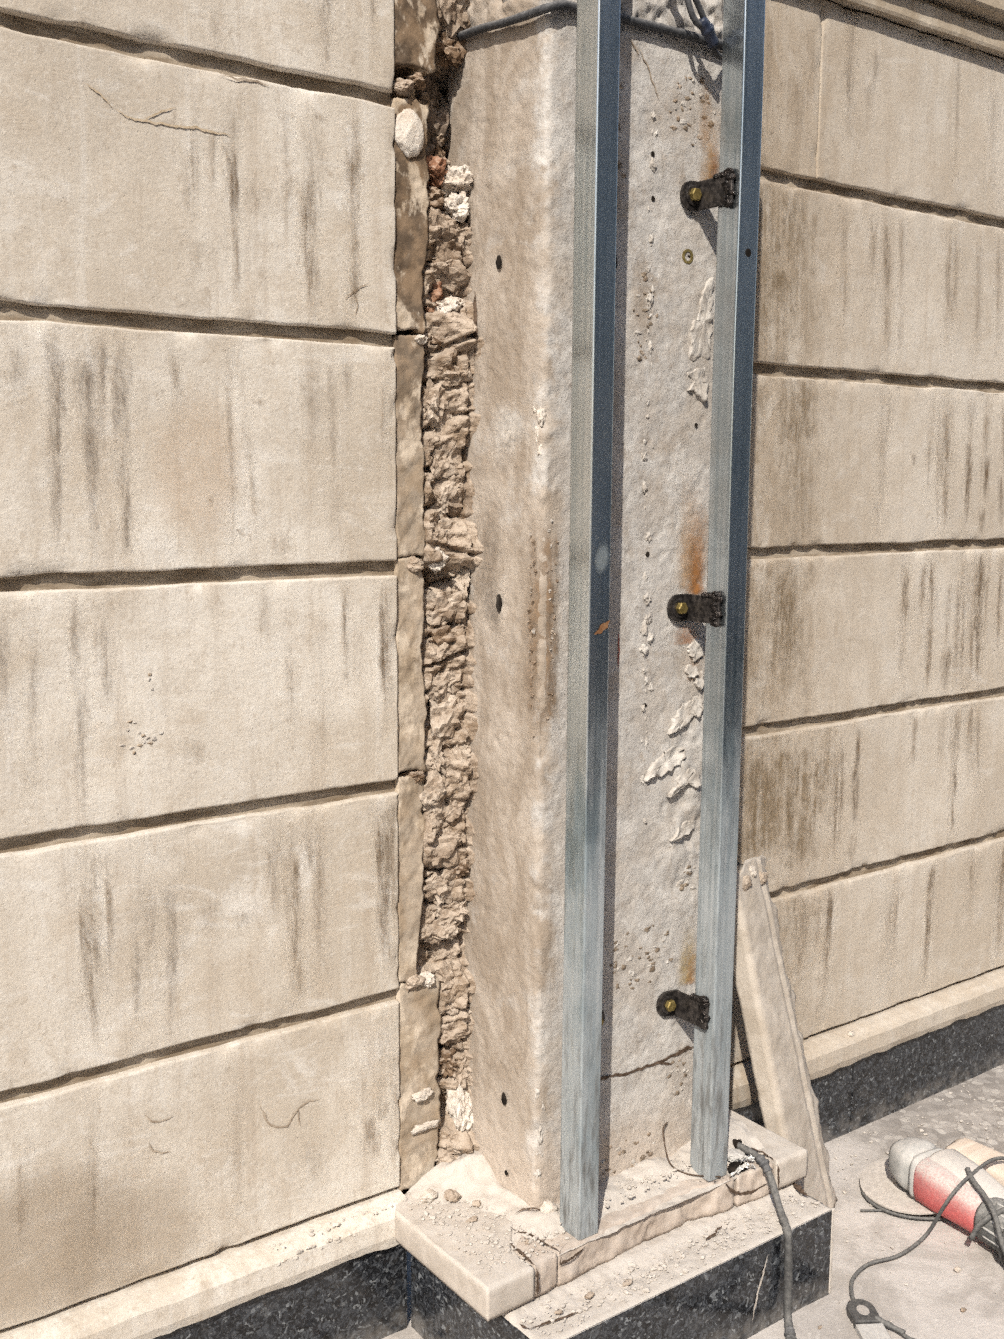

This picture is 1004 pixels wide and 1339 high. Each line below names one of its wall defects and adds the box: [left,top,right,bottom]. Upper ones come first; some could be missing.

crack [87,84,234,137]
corrosion [690,544,701,593]
spalling [390,0,485,1194]
spalling [644,637,705,799]
leakage [752,756,829,850]
spalling [669,820,695,841]
crack [600,1046,694,1081]